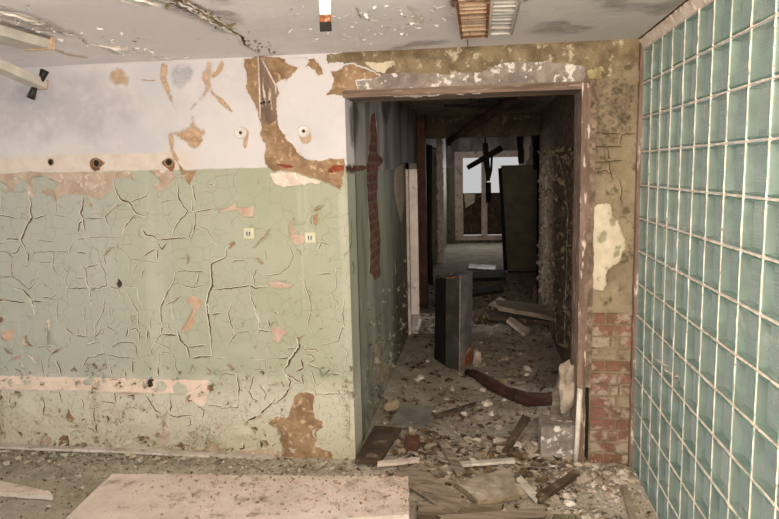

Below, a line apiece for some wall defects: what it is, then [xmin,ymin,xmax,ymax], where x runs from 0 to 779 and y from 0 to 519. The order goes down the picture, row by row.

crack [159,0,260,53]
peeling [0,170,136,204]
peeling [149,160,198,192]
spalling [242,39,640,291]
crack [0,177,355,453]
peeling [0,296,217,407]
spalling [172,391,335,459]